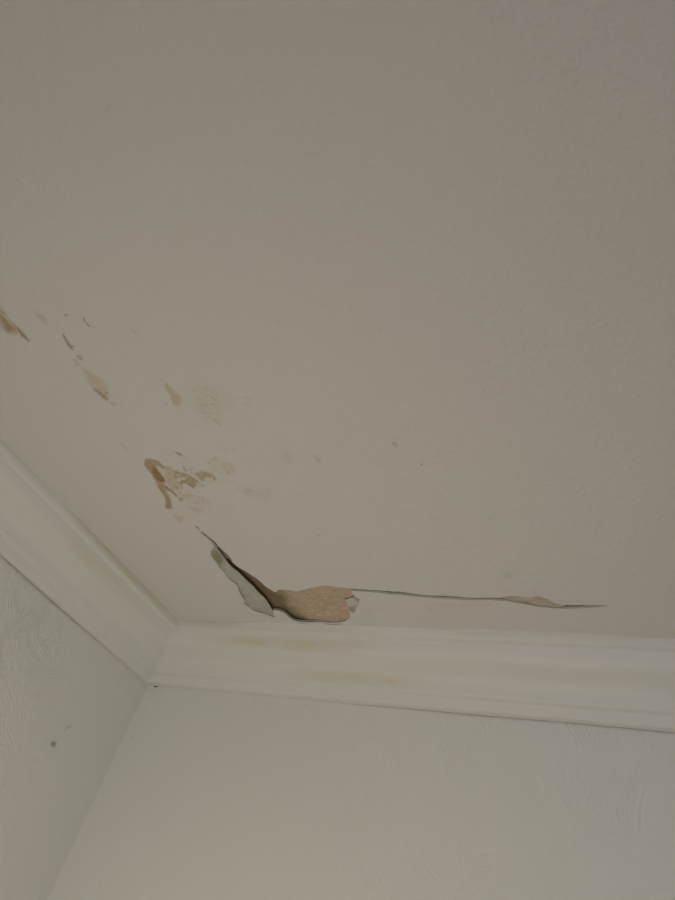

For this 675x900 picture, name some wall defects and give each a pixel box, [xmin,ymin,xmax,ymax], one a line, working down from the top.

peeling [211,547,360,623]
crack [353,589,632,611]